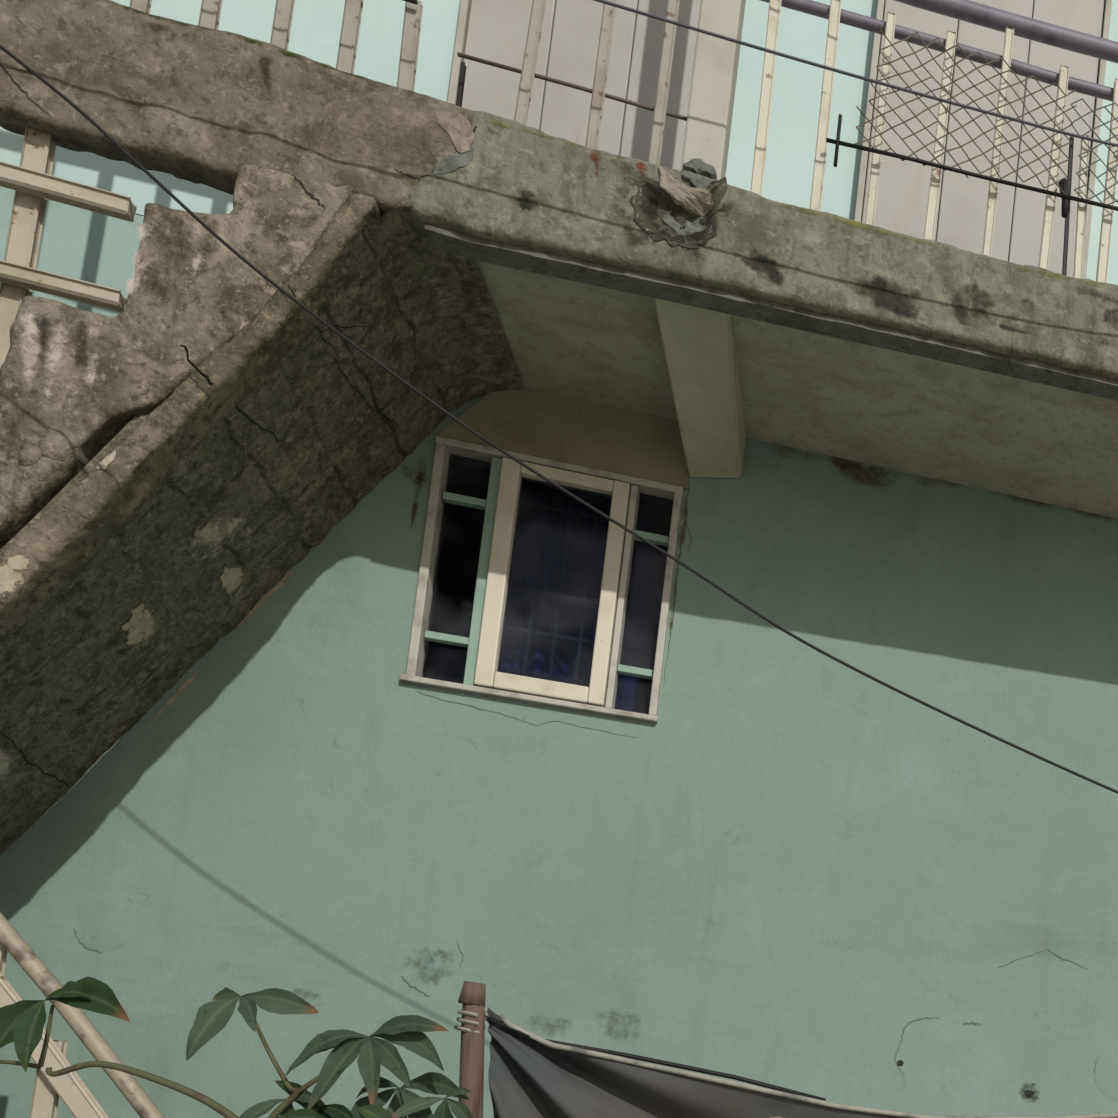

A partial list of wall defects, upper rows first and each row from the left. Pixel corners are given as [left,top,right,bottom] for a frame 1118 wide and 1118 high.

spalling [348,104,475,175]
spalling [623,158,729,250]
damp [744,254,782,284]
damp [861,276,919,317]
damp [953,284,989,322]
crack [180,345,213,399]
crack [236,406,289,445]
flaking render [0,555,29,597]
flaking render [220,567,243,596]
flaking render [122,604,155,646]
crack [417,691,637,738]
crack [0,732,68,786]